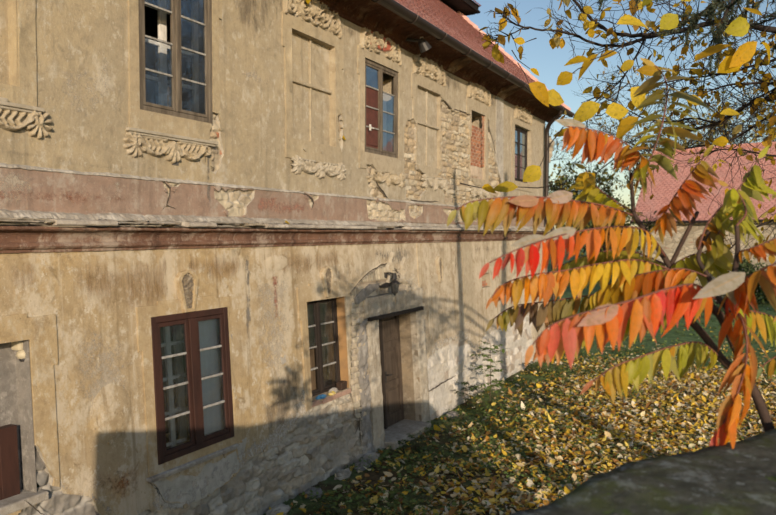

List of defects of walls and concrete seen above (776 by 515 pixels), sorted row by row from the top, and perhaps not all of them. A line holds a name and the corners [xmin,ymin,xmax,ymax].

flaking render [366,120,428,223]
flaking render [436,98,480,222]
flaking render [488,133,500,200]
flaking render [135,264,411,515]
flaking render [427,313,533,420]
flaking render [18,446,99,515]